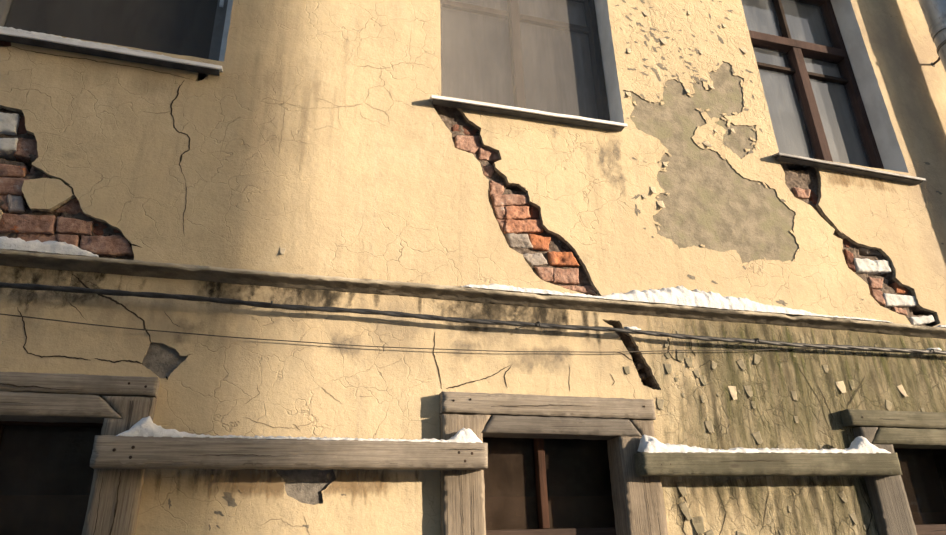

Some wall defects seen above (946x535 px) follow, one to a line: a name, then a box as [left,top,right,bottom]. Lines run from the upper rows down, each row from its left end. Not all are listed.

crack [13,46,190,231]
peeling [615,0,818,270]
spalling [0,110,140,260]
spalling [433,105,596,296]
crack [17,275,180,364]
water stain [285,288,352,307]
crack [433,333,512,389]
water stain [442,300,568,333]
crack [610,332,647,385]
crack [668,337,786,427]
spalling [833,233,935,327]
spalling [275,469,336,505]